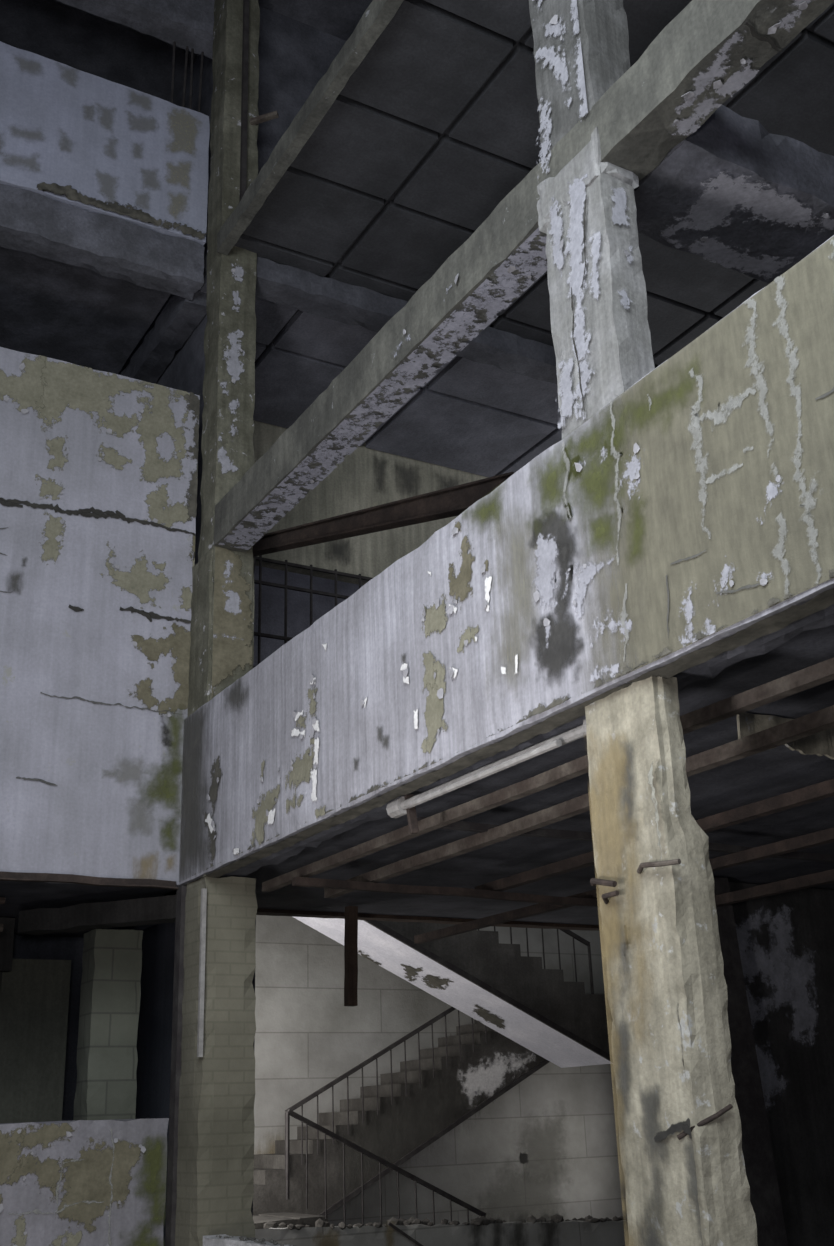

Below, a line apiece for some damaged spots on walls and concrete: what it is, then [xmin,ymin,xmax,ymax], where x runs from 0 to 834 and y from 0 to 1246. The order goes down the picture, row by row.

peeling [672,32,759,136]
crack [69,604,84,612]
crack [0,498,196,555]
peeling [0,355,200,565]
crack [120,606,191,623]
peeling [212,227,547,697]
leakage [497,443,583,678]
leakage [610,402,621,565]
leakage [688,276,821,584]
leakage [773,513,792,598]
crack [40,692,178,714]
spalling [184,521,834,886]